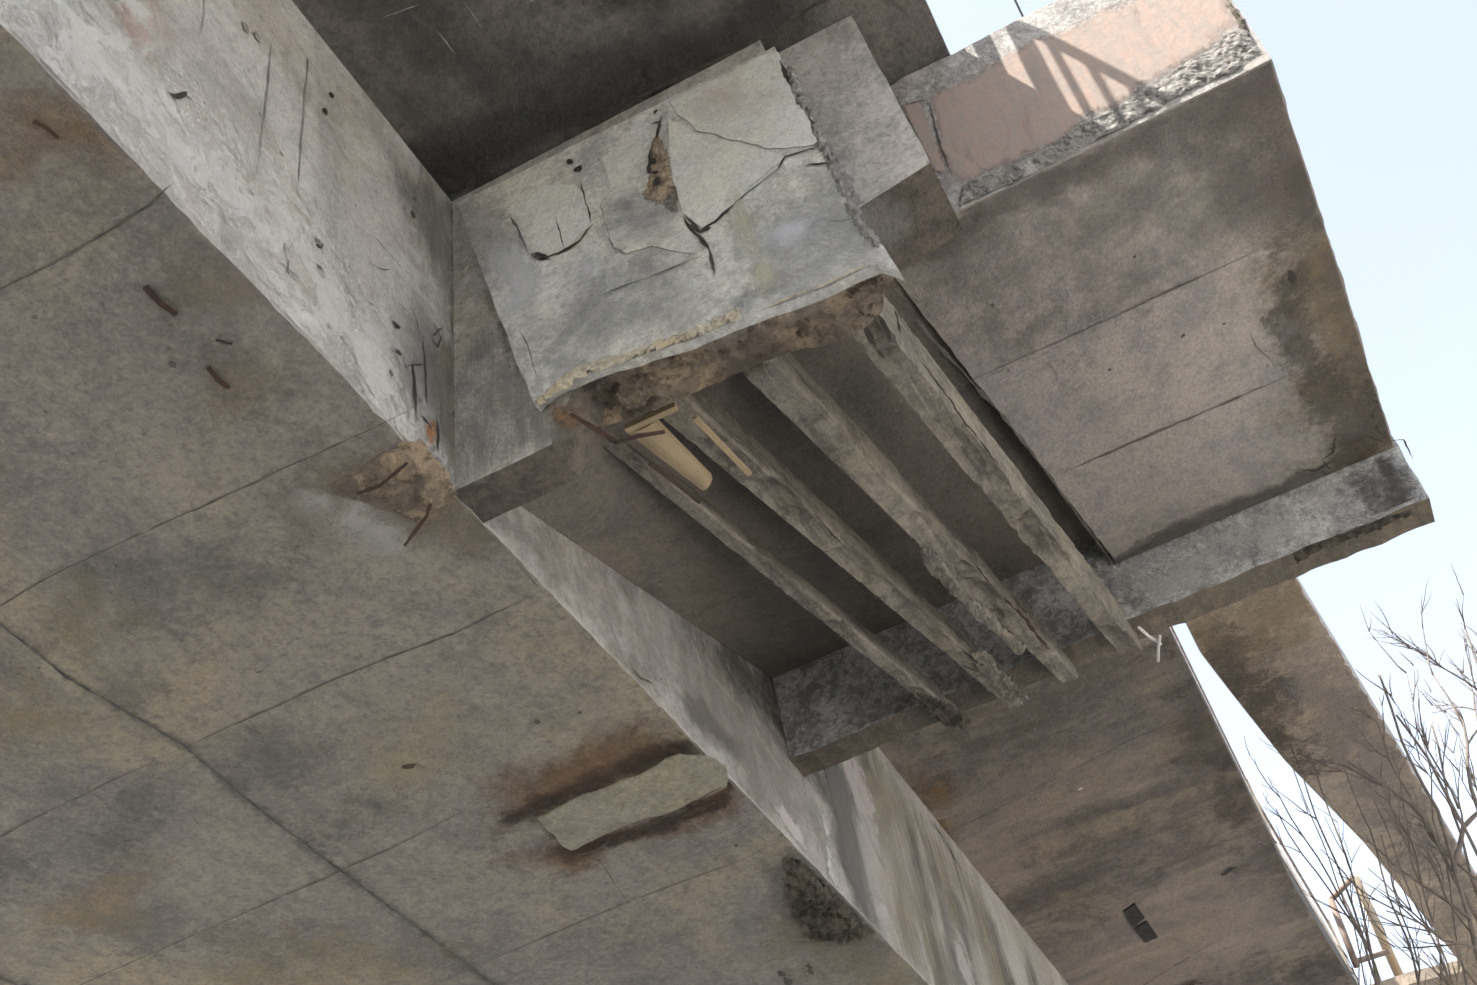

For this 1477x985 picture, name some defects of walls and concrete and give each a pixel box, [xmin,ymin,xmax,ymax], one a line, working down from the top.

spalling [958,0,1264,207]
crack [510,176,615,260]
crack [597,60,831,297]
damp [923,63,1417,616]
spalling [569,413,665,444]
spalling [319,439,459,547]
spalling [920,544,1029,705]
corrosion [501,726,693,826]
corrosion [530,781,735,873]